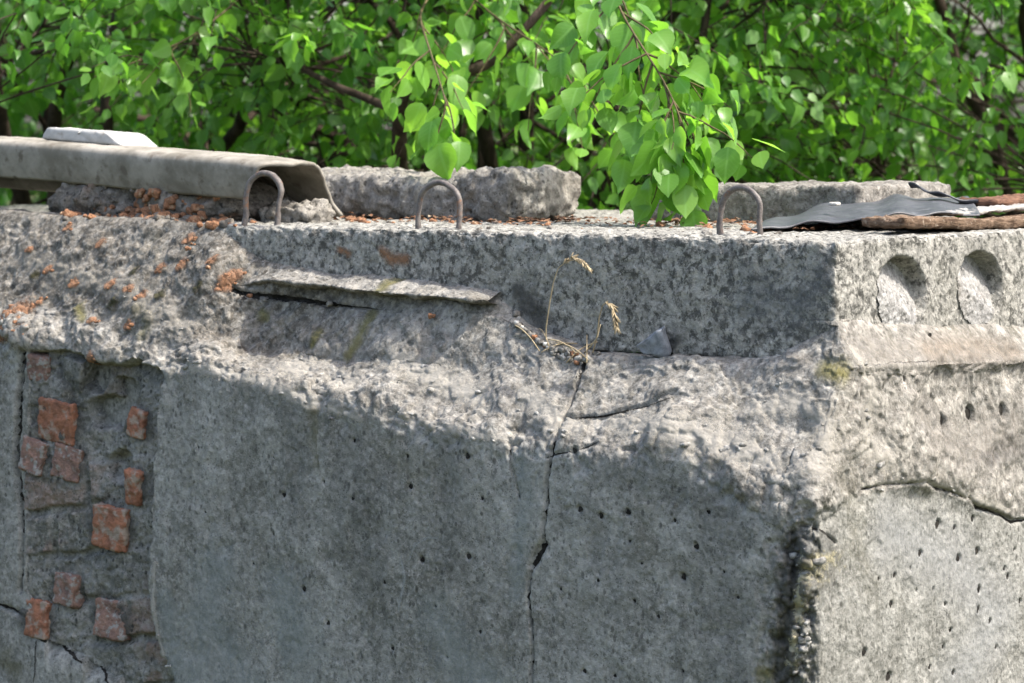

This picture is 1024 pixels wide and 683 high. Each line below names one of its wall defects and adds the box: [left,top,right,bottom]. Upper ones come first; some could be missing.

spalling [18,396,86,483]
spalling [126,406,152,440]
spalling [89,467,150,553]
crack [527,362,672,667]
crack [861,482,1024,524]
crack [0,604,21,614]
spalling [18,572,132,642]
crack [33,639,109,683]